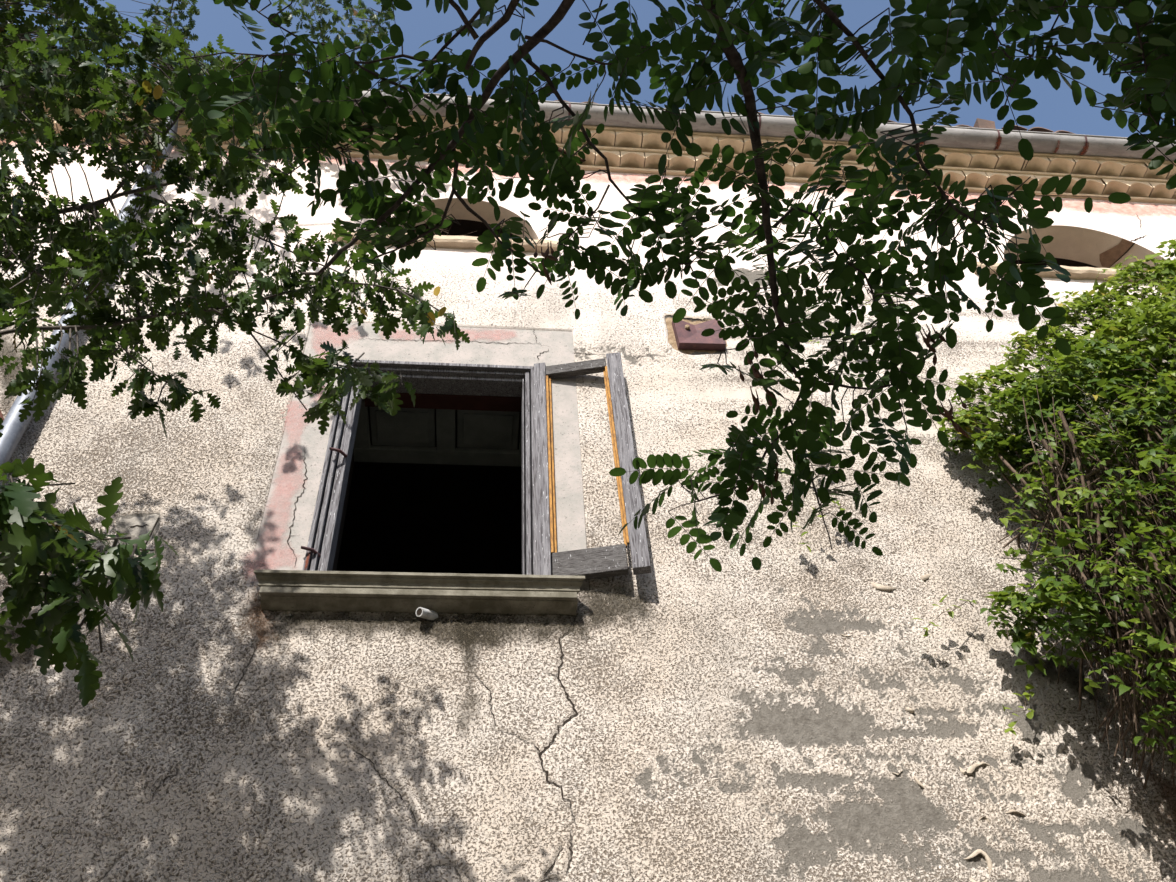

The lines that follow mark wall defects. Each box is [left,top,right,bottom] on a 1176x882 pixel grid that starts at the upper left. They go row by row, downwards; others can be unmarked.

leakage [1026,651,1102,704]
crack [473,611,578,882]
crack [348,747,462,882]